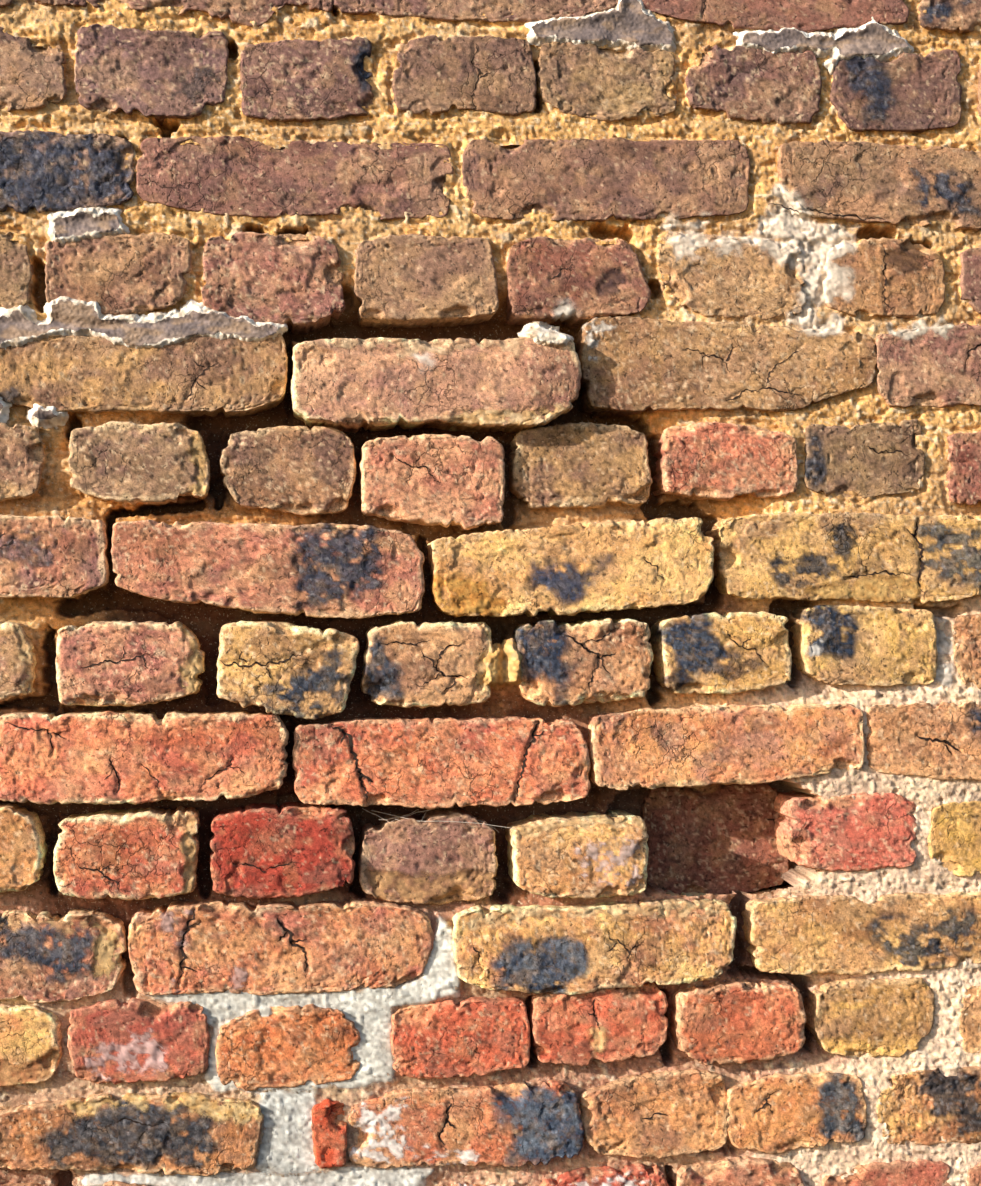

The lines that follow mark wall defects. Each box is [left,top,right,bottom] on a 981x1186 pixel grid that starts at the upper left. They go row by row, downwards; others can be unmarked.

crack [685,346,804,401]
crack [81,647,158,668]
crack [381,640,472,692]
crack [7,722,64,755]
crack [104,757,160,793]
crack [199,757,244,790]
crack [331,725,372,800]
crack [514,721,544,800]
crack [177,909,200,987]
crack [277,918,308,972]
crack [438,1104,455,1149]
damp [602,1173,645,1186]